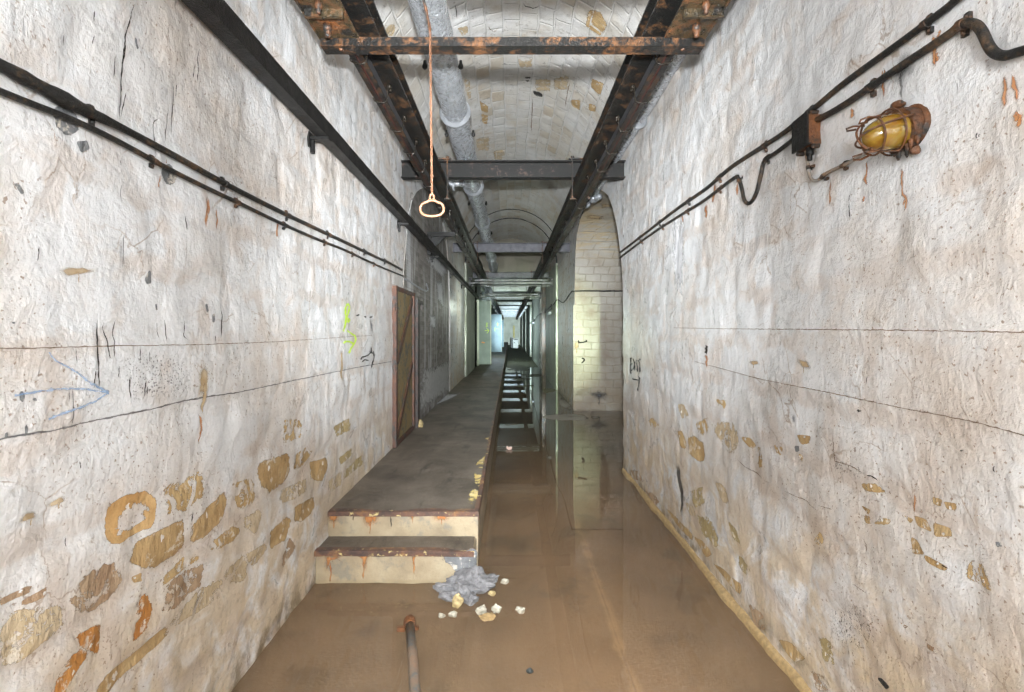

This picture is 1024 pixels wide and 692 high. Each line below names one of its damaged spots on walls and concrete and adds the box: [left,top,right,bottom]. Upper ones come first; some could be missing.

rust [1002,76,1018,104]
flaking render [678,404,762,467]
flaking render [774,435,810,461]
flaking render [862,506,891,525]
flaking render [933,497,957,510]
flaking render [0,418,363,692]
flaking render [631,470,748,594]
flaking render [905,516,952,570]
flaking render [966,561,991,590]